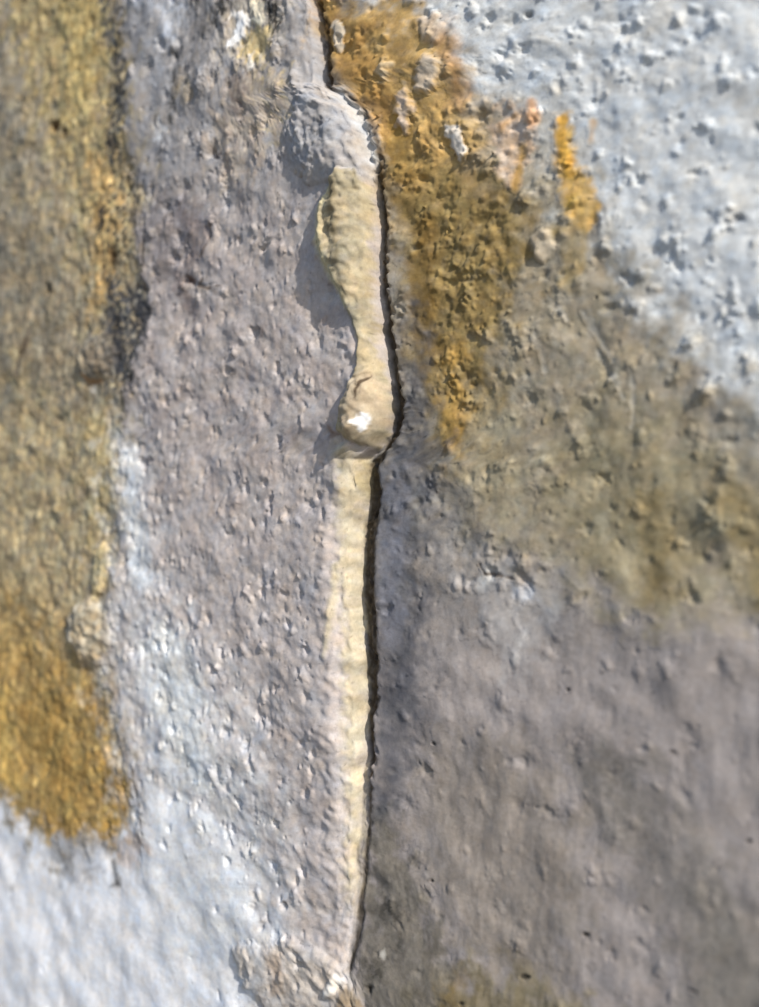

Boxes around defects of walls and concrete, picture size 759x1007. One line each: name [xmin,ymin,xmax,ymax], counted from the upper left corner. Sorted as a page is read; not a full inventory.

damp [0,0,336,1007]
crack [315,0,424,974]
rust [299,0,605,484]
damp [490,78,581,223]
damp [347,133,759,1007]